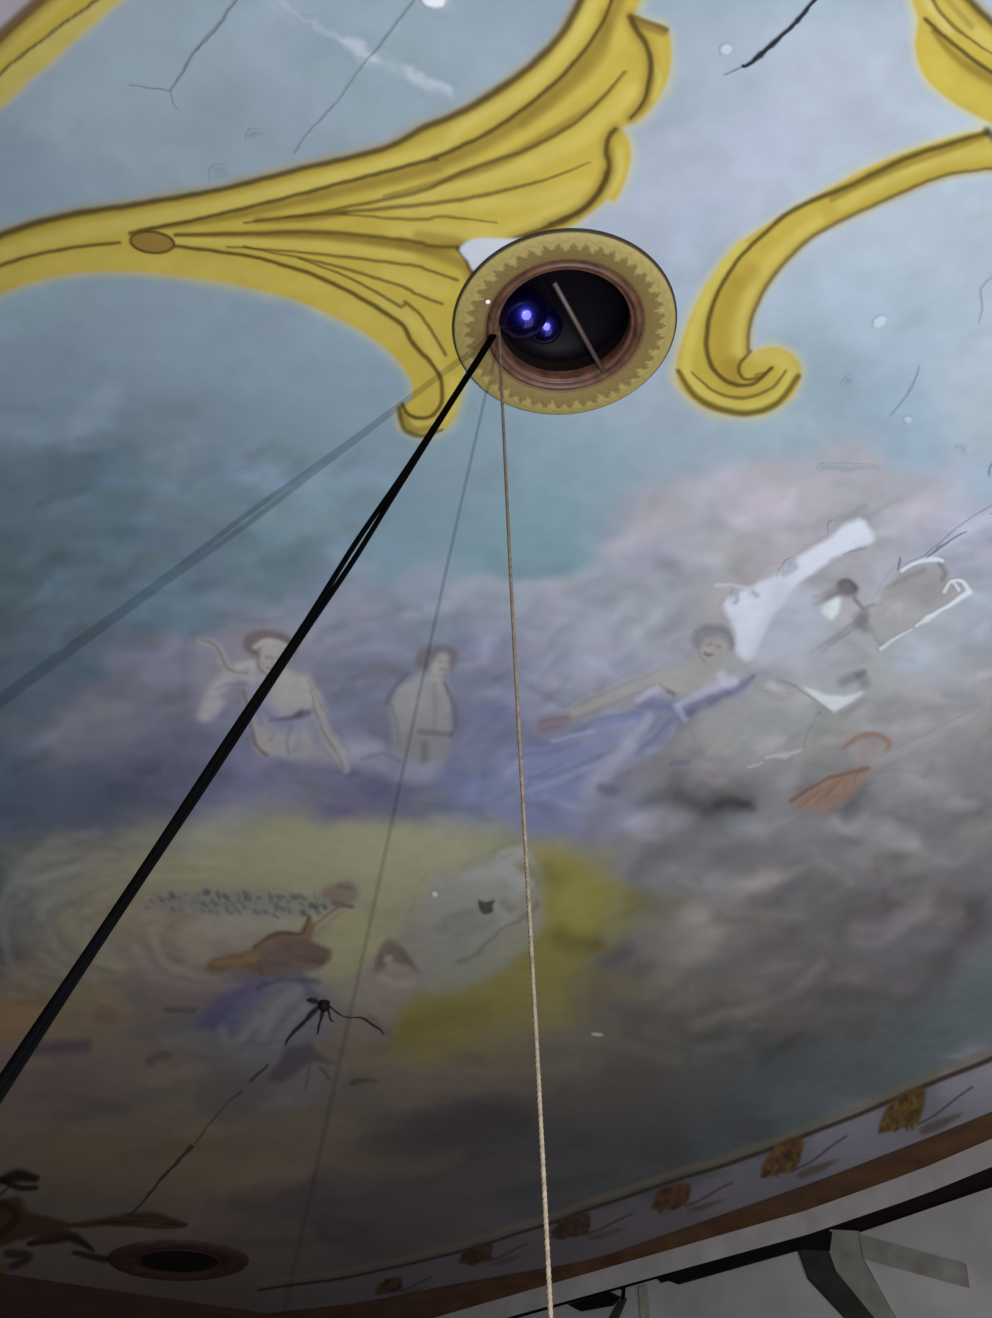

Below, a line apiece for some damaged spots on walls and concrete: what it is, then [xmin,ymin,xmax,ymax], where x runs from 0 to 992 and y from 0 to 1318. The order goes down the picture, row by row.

crack [725,0,817,75]
spalling [898,506,992,574]
peeling [712,515,879,676]
spalling [877,578,974,652]
crack [129,998,385,1217]